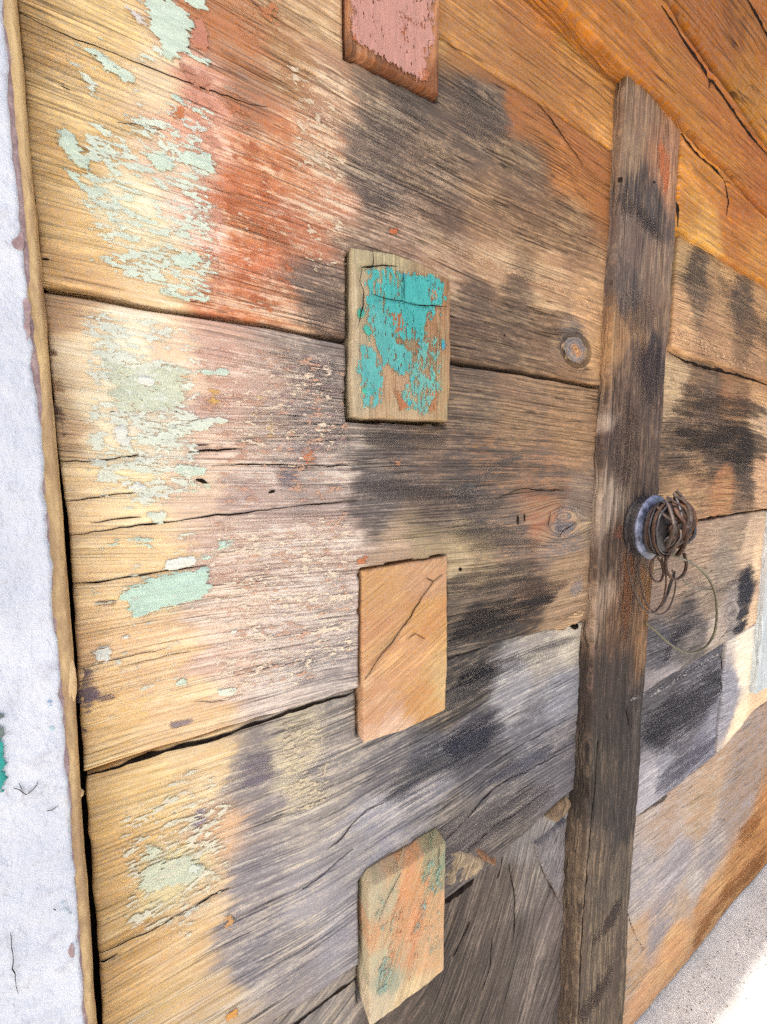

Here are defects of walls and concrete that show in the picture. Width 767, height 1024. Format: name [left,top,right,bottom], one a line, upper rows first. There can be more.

peeling [124,0,214,92]
peeling [347,0,435,83]
crack [662,6,767,155]
peeling [55,124,131,240]
crack [680,133,729,215]
peeling [353,266,447,415]
peeling [102,358,229,447]
crack [60,454,139,462]
crack [188,444,356,467]
crack [62,492,356,537]
peeling [119,540,234,620]
crack [82,575,442,776]